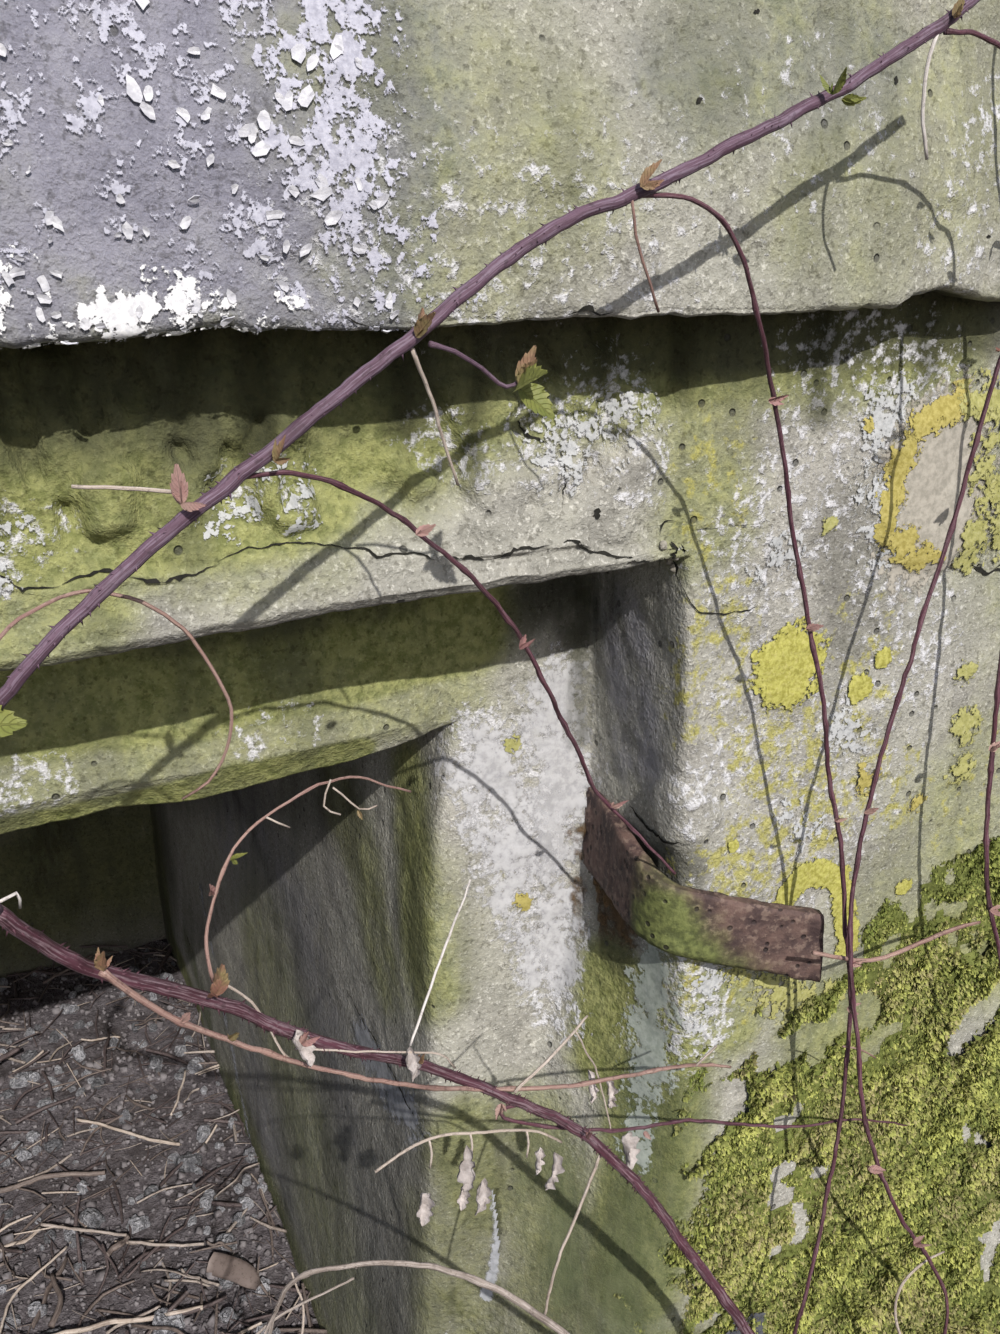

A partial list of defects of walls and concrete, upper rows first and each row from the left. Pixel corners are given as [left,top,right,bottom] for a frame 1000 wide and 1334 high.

peeling [0,0,453,333]
crack [0,540,762,616]
crack [971,565,1000,576]
corrosion [571,850,638,949]